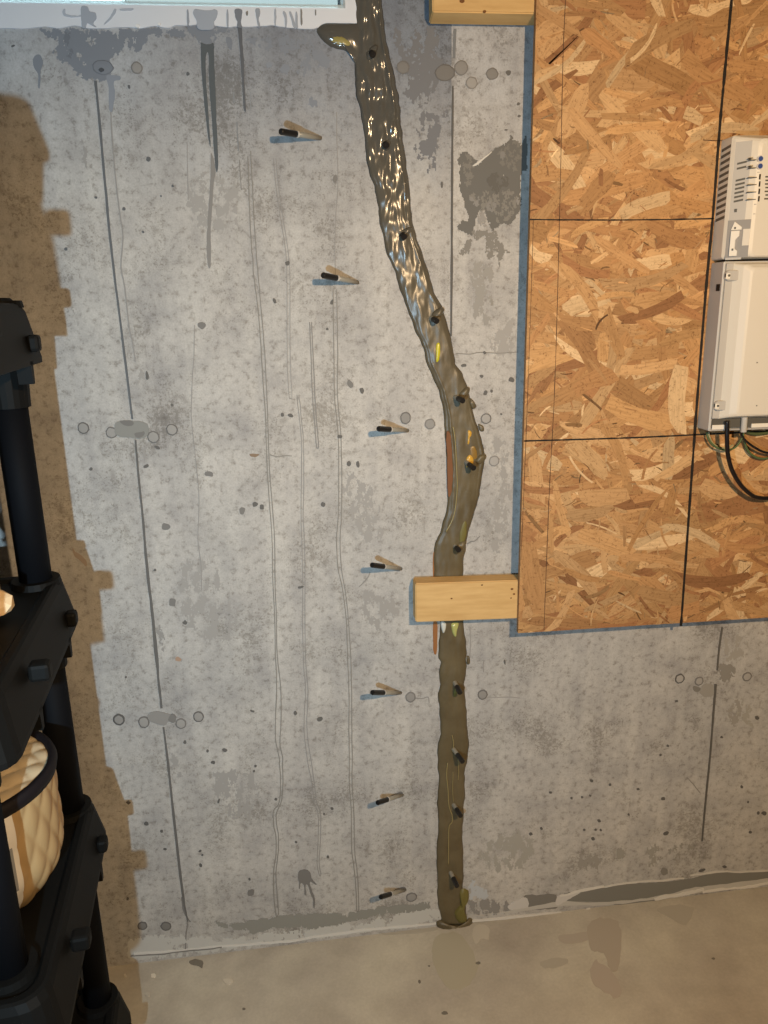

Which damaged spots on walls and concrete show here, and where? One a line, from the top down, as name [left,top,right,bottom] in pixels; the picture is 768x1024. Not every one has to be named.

damp [33,25,232,113]
damp [457,135,528,357]
damp [134,122,479,990]
peeling [468,878,768,917]